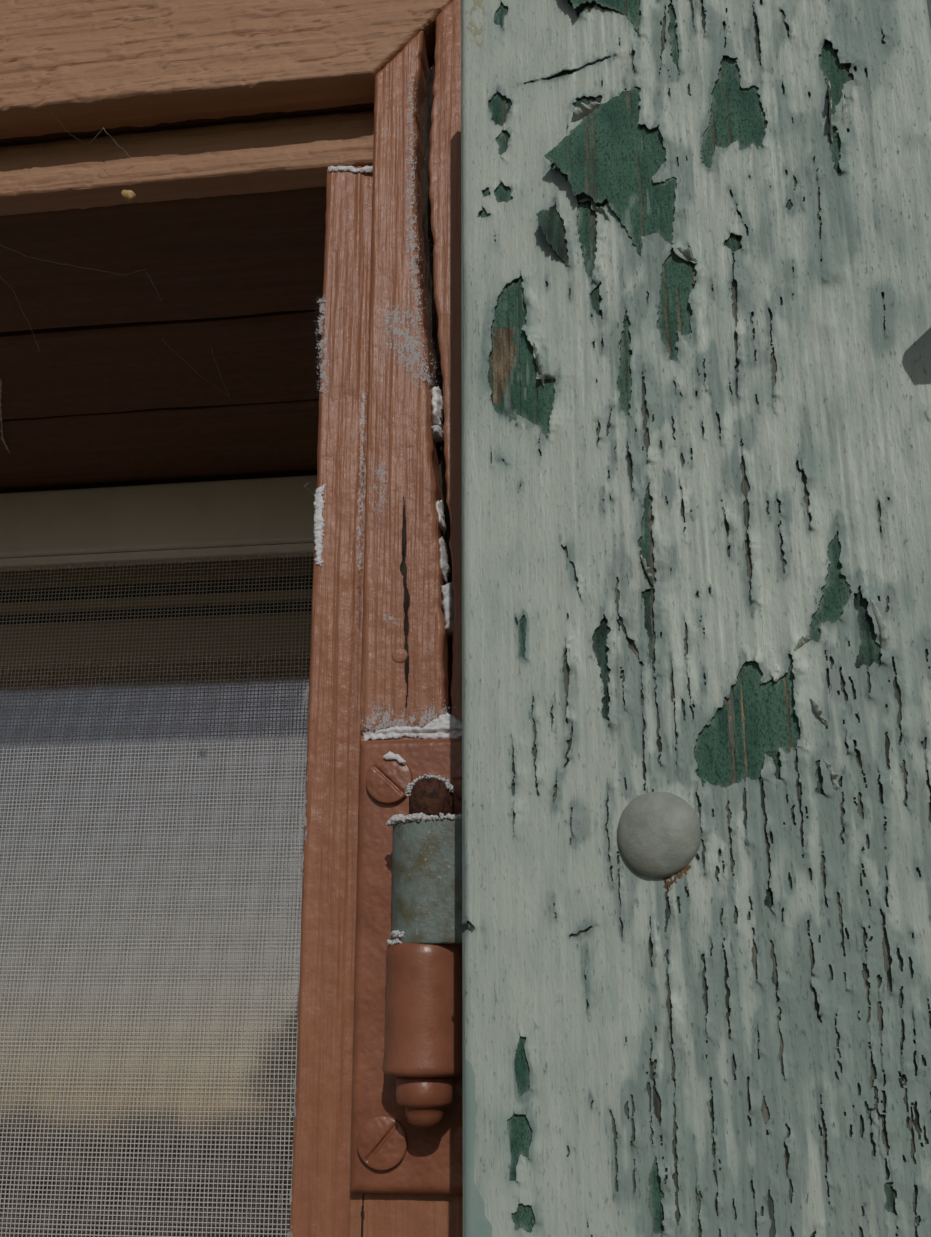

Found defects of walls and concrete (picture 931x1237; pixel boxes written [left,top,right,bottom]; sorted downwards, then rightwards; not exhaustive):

peeling [488,83,516,159]
peeling [701,51,769,169]
peeling [819,34,861,174]
peeling [536,81,706,361]
crack [421,65,454,713]
peeling [488,270,556,436]
crack [400,497,410,708]
peeling [593,607,619,727]
peeling [638,481,665,676]
peeling [694,520,890,788]
crack [358,1193,366,1237]
peeling [508,1032,542,1234]